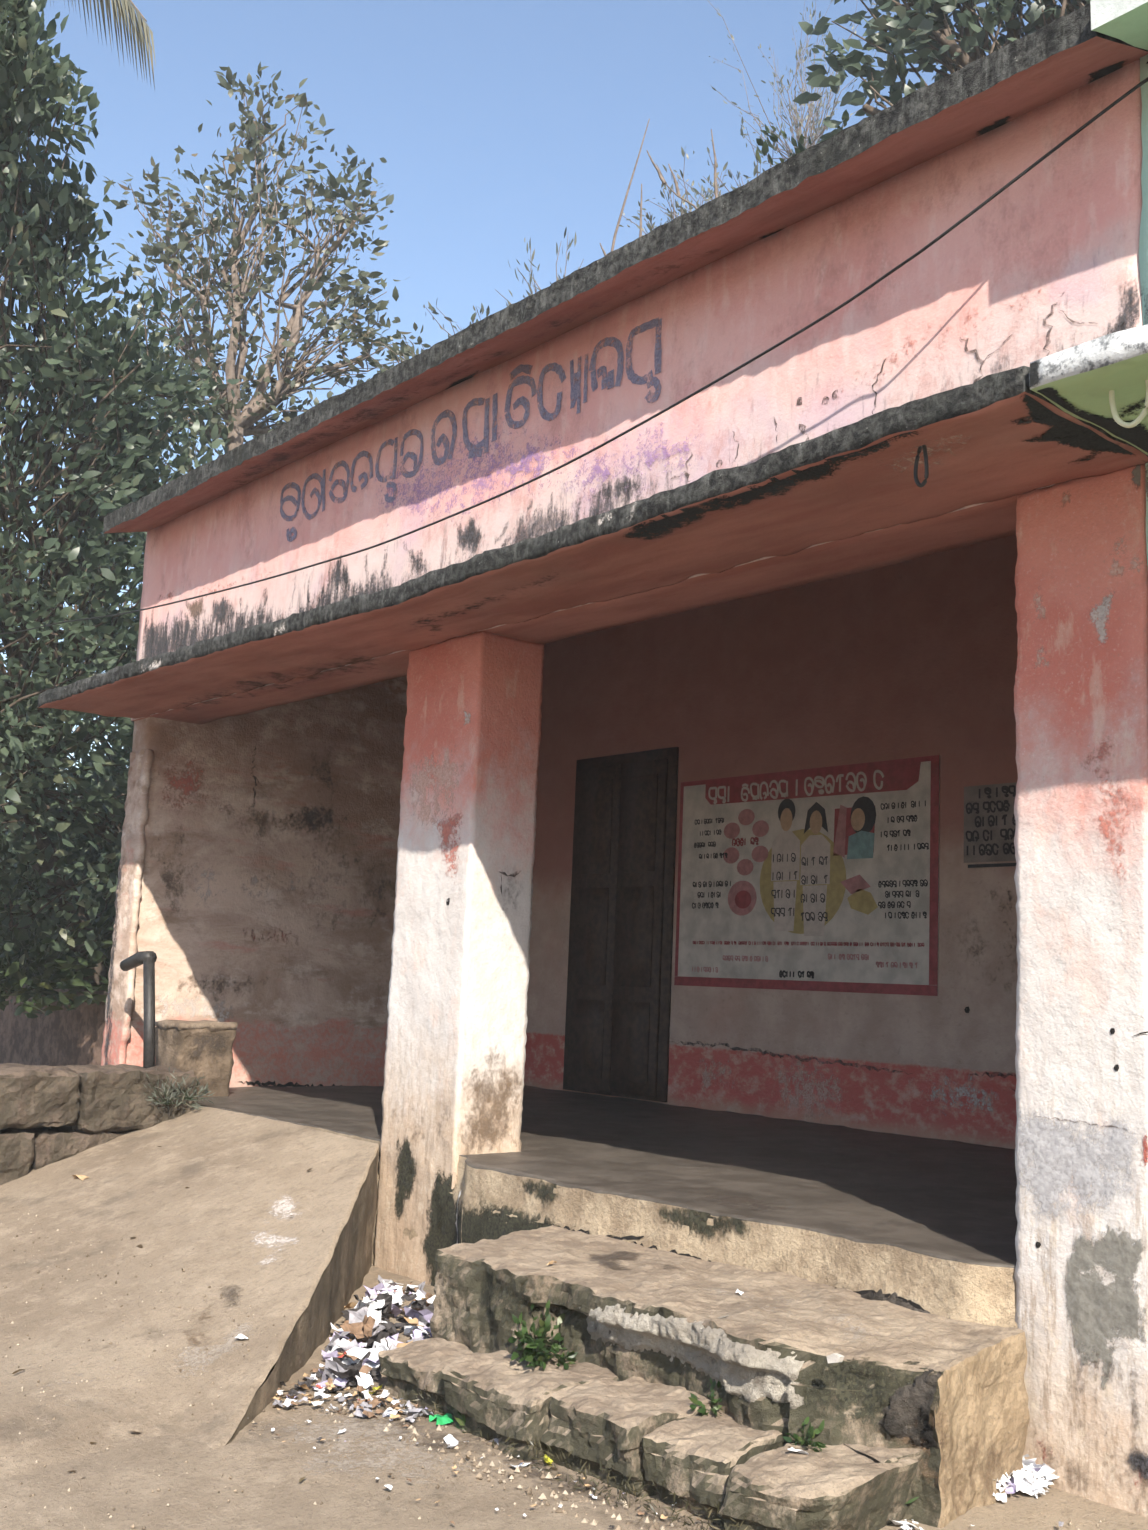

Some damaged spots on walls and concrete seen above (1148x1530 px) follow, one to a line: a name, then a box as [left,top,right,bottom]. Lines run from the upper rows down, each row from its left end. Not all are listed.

crack [960,292,1093,383]
crack [872,358,886,414]
water stain [457,475,656,552]
water stain [410,551,425,578]
water stain [143,555,391,658]
peeling [1091,595,1113,642]
water stain [395,1139,416,1218]
water stain [423,1170,559,1286]
spalling [579,1304,804,1409]